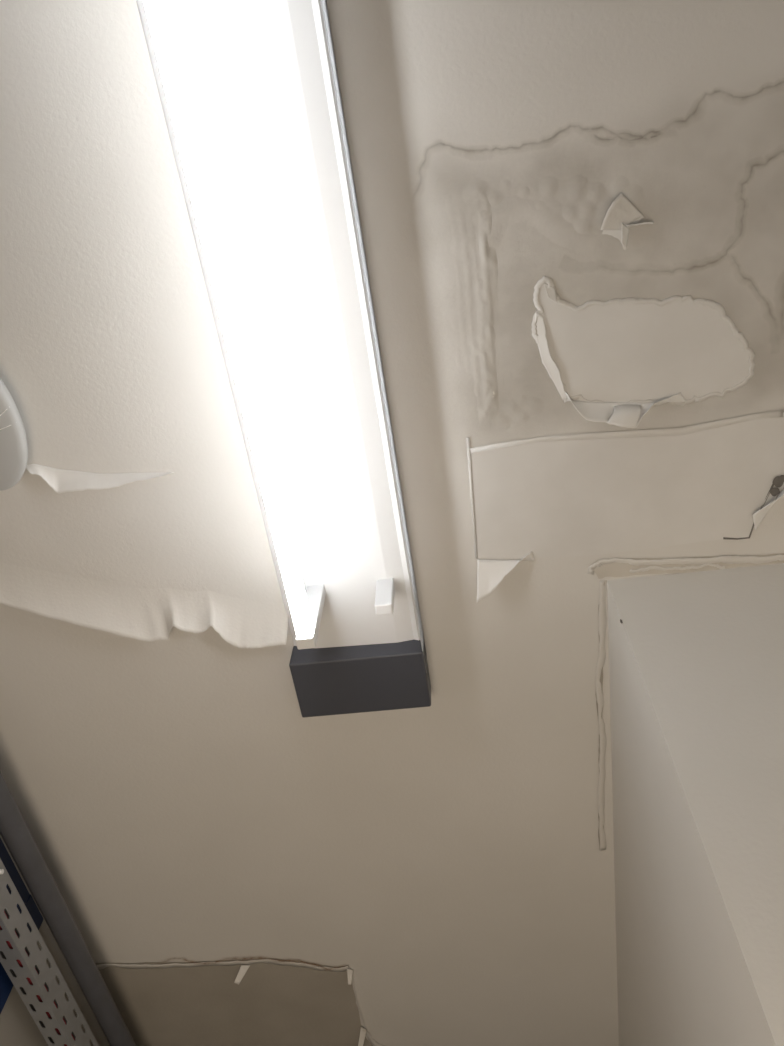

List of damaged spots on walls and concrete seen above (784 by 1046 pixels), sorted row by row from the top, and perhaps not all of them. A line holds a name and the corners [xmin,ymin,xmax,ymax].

peeling [531,276,755,428]
peeling [0,563,288,649]
flaking render [96,958,391,1046]